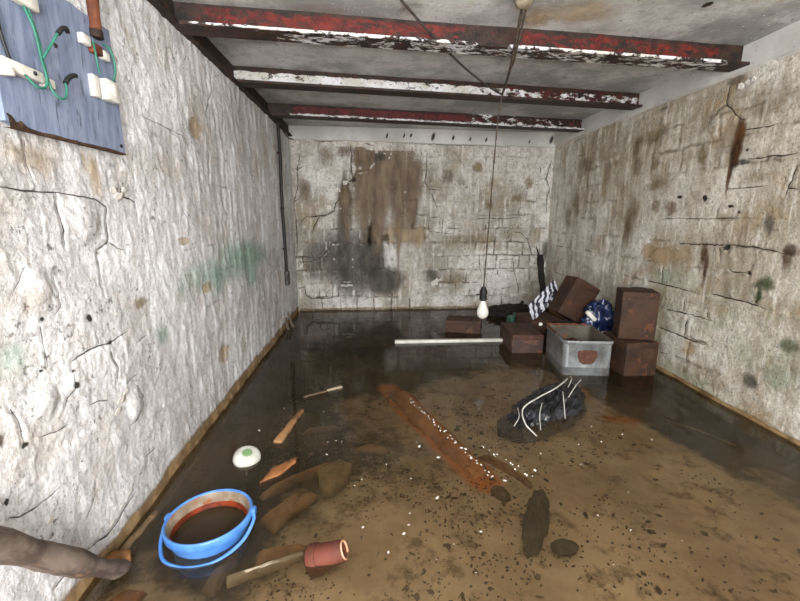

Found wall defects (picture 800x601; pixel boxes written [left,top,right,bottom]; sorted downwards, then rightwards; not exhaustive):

crack [0,142,124,282]
crack [294,140,373,266]
leakage [310,150,423,294]
rust [726,120,746,192]
crack [716,89,780,130]
crack [748,152,799,195]